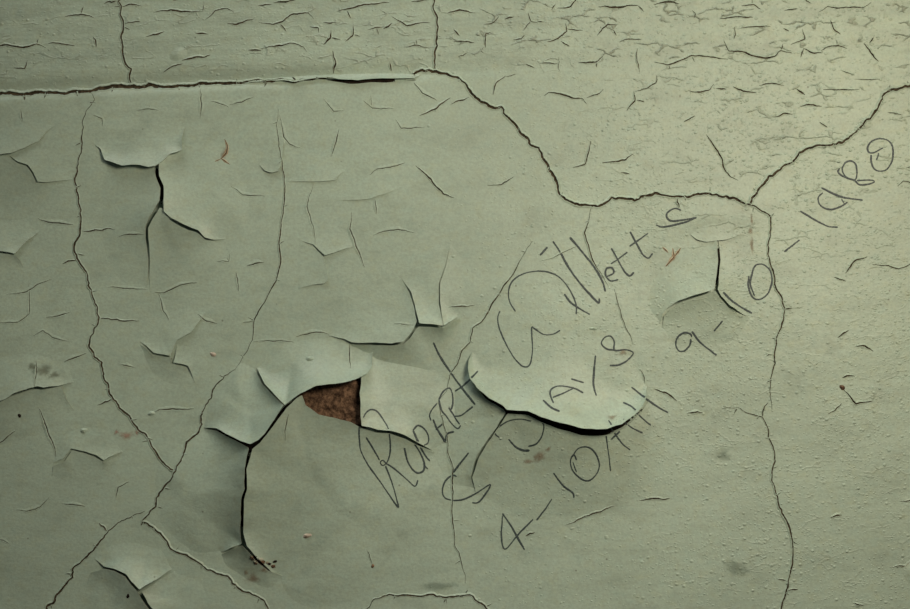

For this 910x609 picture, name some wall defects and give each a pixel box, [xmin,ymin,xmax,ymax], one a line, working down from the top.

peeling [0,123,73,288]
peeling [95,107,249,384]
crack [0,0,389,609]
crack [347,200,414,267]
crack [361,0,910,609]
peeling [649,223,757,347]
peeling [0,354,74,445]
peeling [51,428,122,483]
peeling [155,244,667,608]
peeling [79,543,207,609]